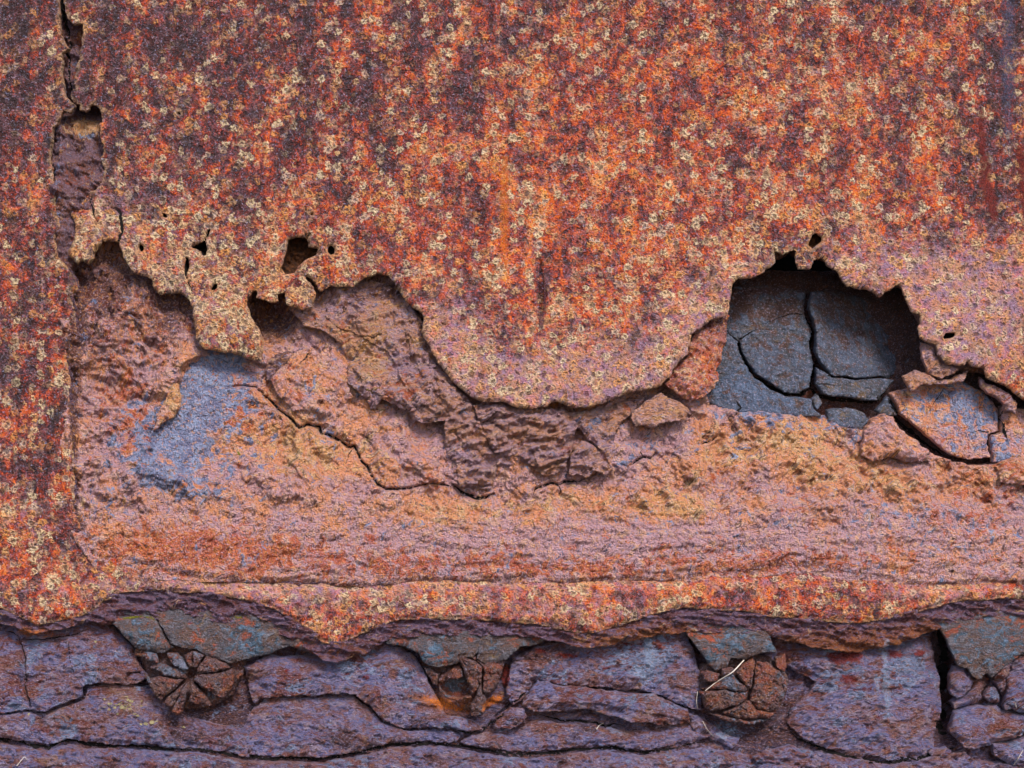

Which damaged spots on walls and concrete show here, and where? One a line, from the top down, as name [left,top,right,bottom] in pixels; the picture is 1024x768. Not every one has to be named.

crack [61,0,73,91]
peeling [68,227,105,263]
rust [49,3,1024,587]
crack [238,385,490,500]
spalling [150,275,729,491]
crack [727,313,957,459]
peeling [859,413,930,463]
peeling [919,330,968,379]
peeling [978,377,1017,414]
peeling [994,457,1024,486]
crack [0,693,713,761]
crack [789,630,953,764]